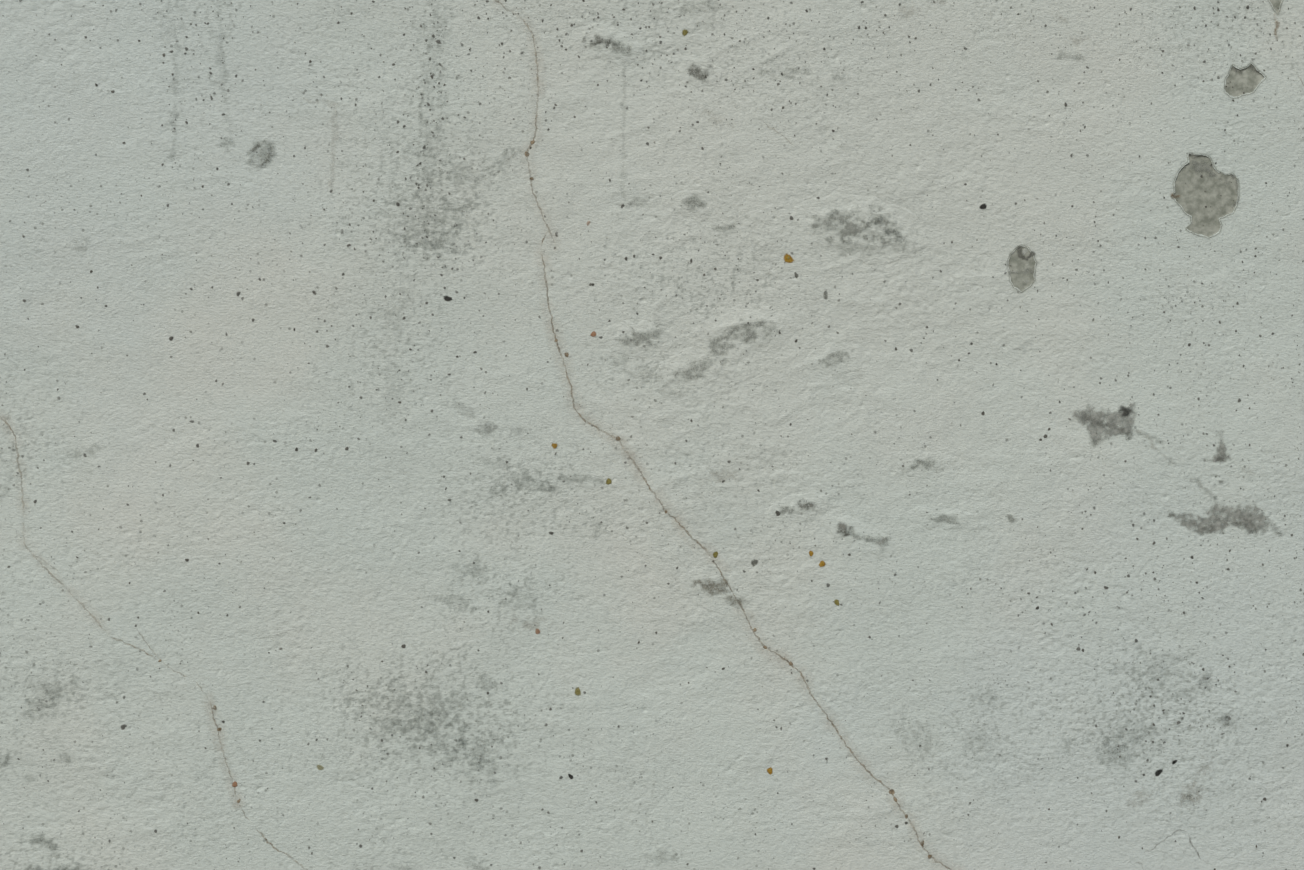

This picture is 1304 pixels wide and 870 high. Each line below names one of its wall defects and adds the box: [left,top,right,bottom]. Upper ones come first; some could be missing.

peeling [1222,62,1267,99]
peeling [1170,152,1241,239]
peeling [1006,244,1037,293]
spalling [1074,404,1134,442]
spalling [1171,504,1268,533]
crack [753,628,950,869]